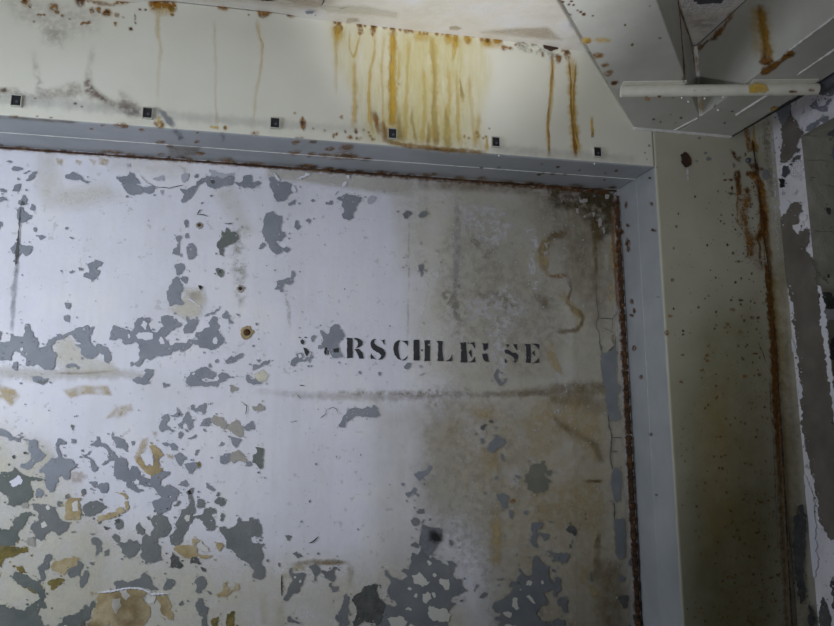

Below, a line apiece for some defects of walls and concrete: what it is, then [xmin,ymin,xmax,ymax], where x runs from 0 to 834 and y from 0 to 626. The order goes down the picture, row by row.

peeling [180,169,310,206]
corrosion [354,24,490,154]
corrosion [542,45,579,153]
peeling [0,218,271,397]
leakage [0,446,395,626]
peeling [0,401,581,626]
corrosion [0,130,642,626]
leakage [431,178,629,626]
crack [595,278,618,352]
crack [608,414,622,469]
corrosion [692,127,782,626]
spalling [779,200,834,626]